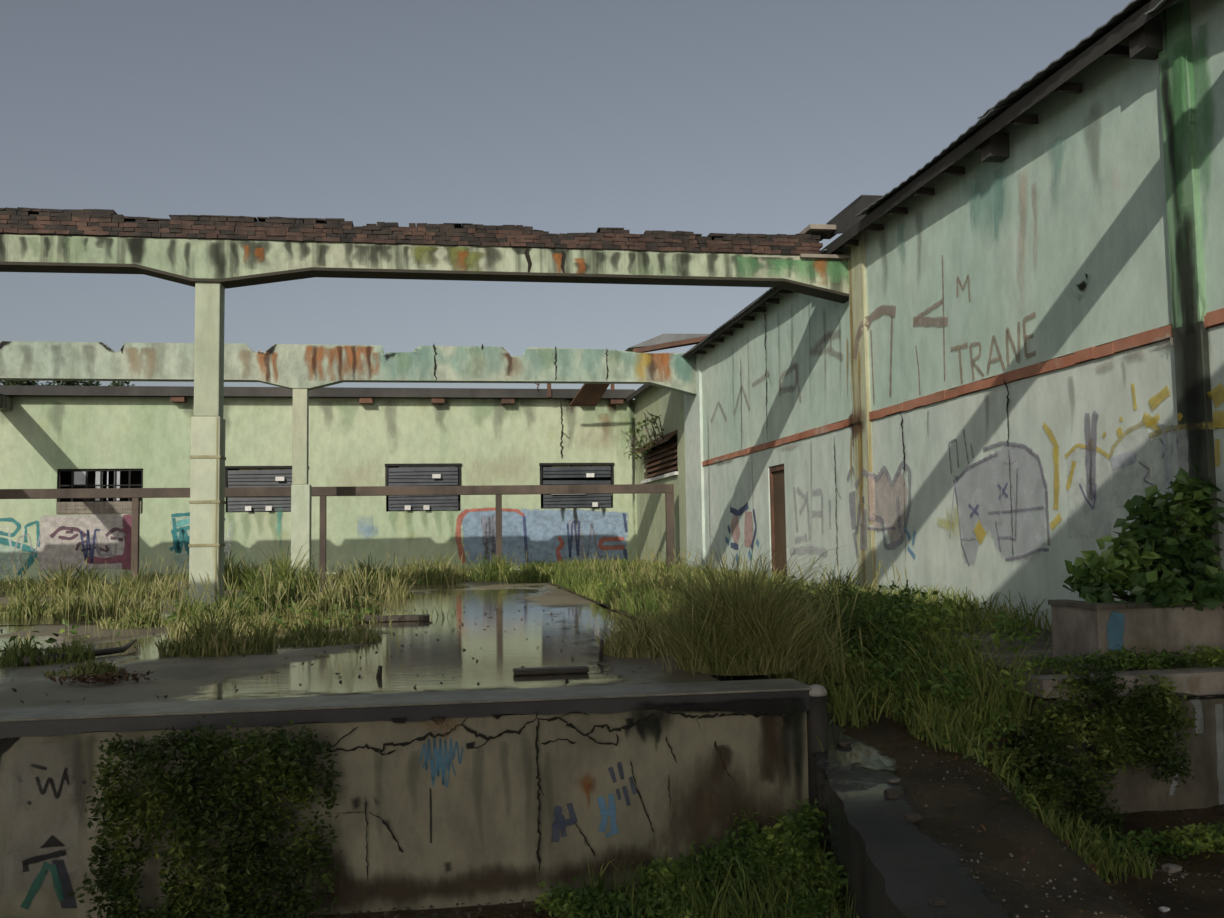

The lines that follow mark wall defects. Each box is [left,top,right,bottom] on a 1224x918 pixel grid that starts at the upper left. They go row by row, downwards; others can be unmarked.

damp [84,236,143,263]
damp [169,240,189,263]
damp [211,241,268,272]
damp [285,241,327,262]
damp [1162,26,1212,467]
corrosion [258,350,277,380]
corrosion [306,345,380,376]
crack [431,343,439,381]
crack [554,346,570,458]
damp [762,699,805,796]
crack [321,711,784,882]
damp [670,745,781,854]